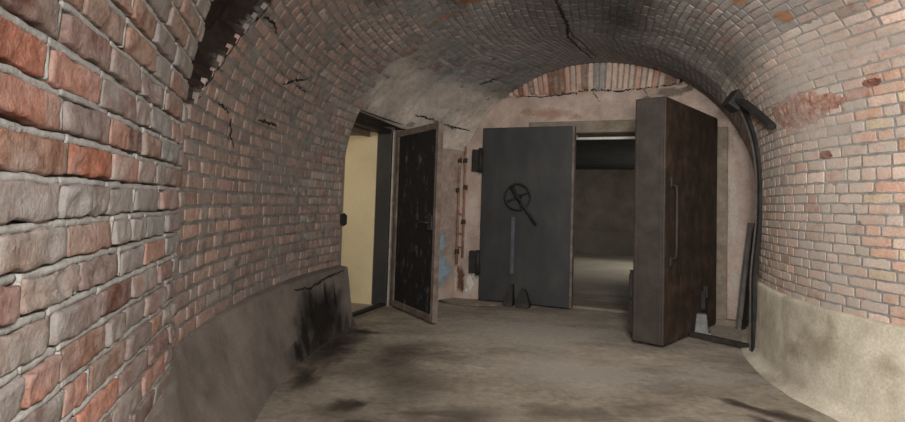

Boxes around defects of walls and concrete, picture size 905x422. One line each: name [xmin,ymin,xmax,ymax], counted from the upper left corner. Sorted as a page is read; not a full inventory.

crack [554,0,596,58]
crack [186,0,277,149]
crack [283,78,308,92]
crack [415,115,470,131]
spalling [772,90,848,130]
damp [295,287,372,384]